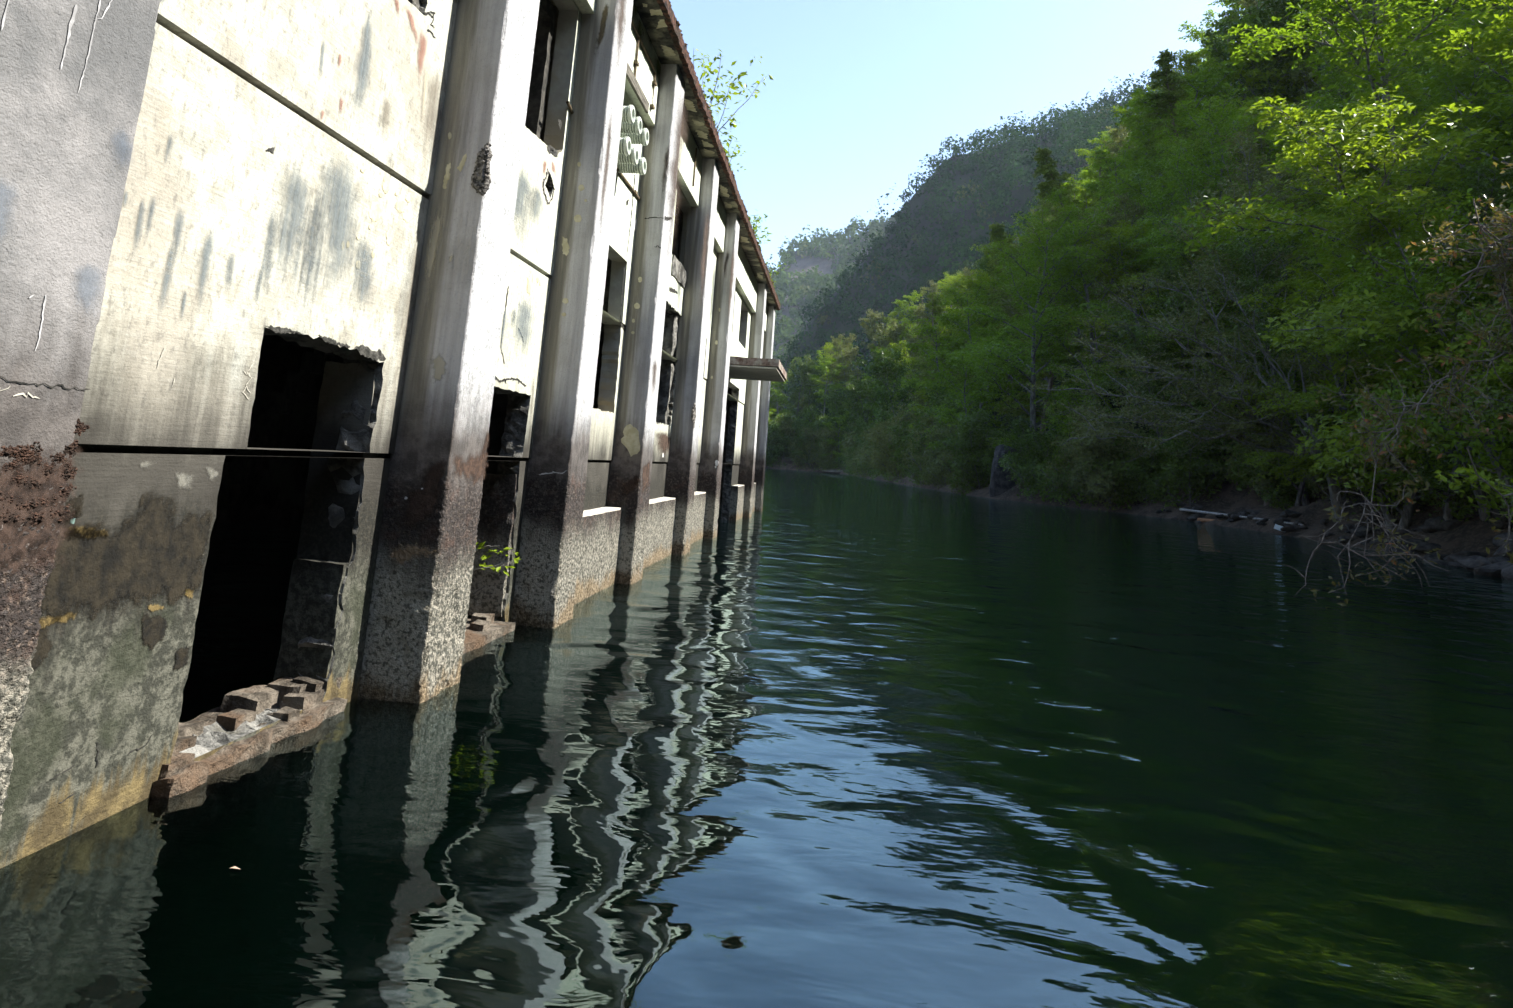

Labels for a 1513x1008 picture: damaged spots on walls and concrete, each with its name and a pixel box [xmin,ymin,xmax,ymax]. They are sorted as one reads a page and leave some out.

water stain [358,20,370,92]
spalling [443,142,493,196]
water stain [125,193,154,237]
water stain [165,218,182,291]
water stain [201,240,211,287]
water stain [257,171,351,295]
water stain [359,244,371,298]